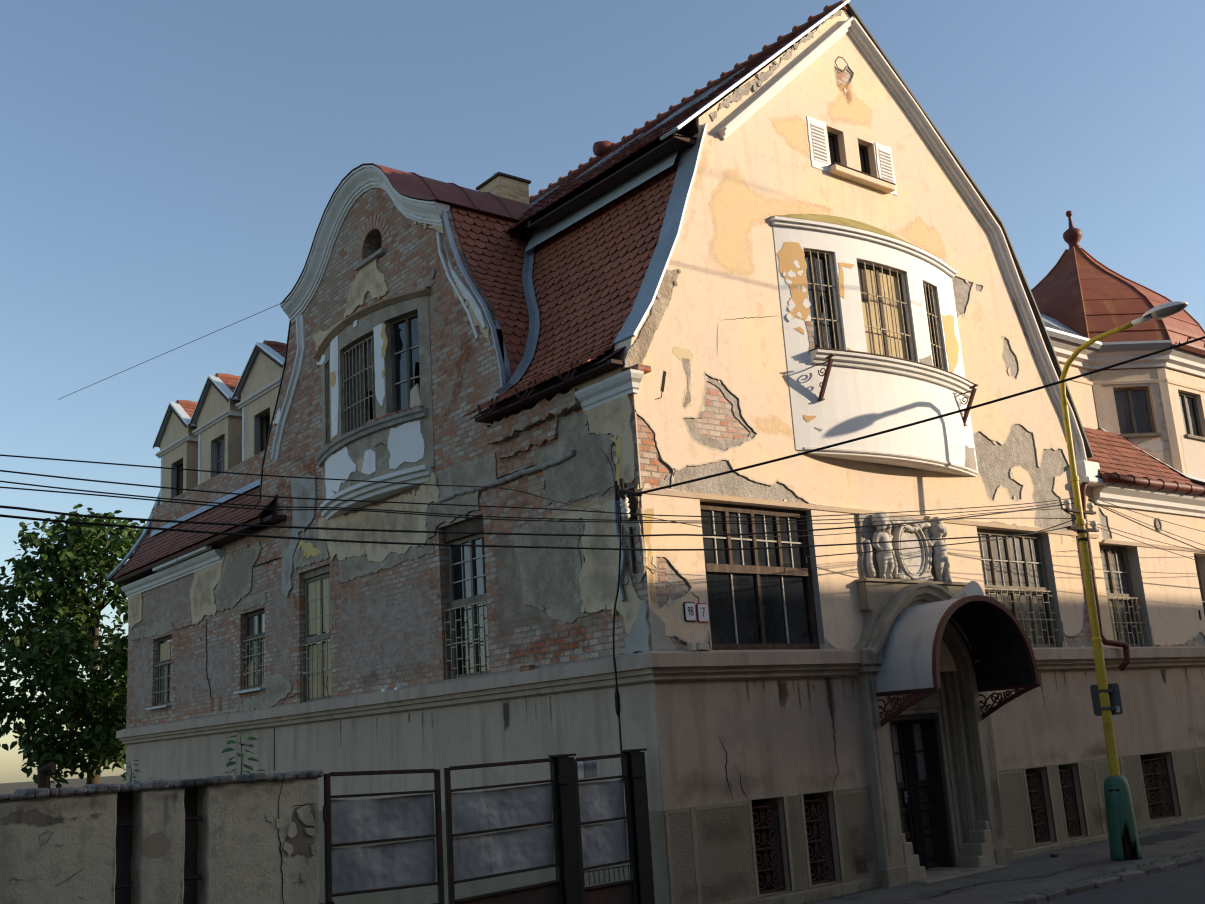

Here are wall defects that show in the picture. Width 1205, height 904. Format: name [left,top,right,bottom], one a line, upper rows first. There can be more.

peeling [777,241,814,354]
peeling [380,324,388,379]
peeling [1002,336,1020,380]
peeling [1013,298,1050,356]
flaking render [617,347,810,609]
peeling [965,422,1077,535]
peeling [1098,506,1113,540]
spalling [667,631,712,650]
crack [265,755,317,904]